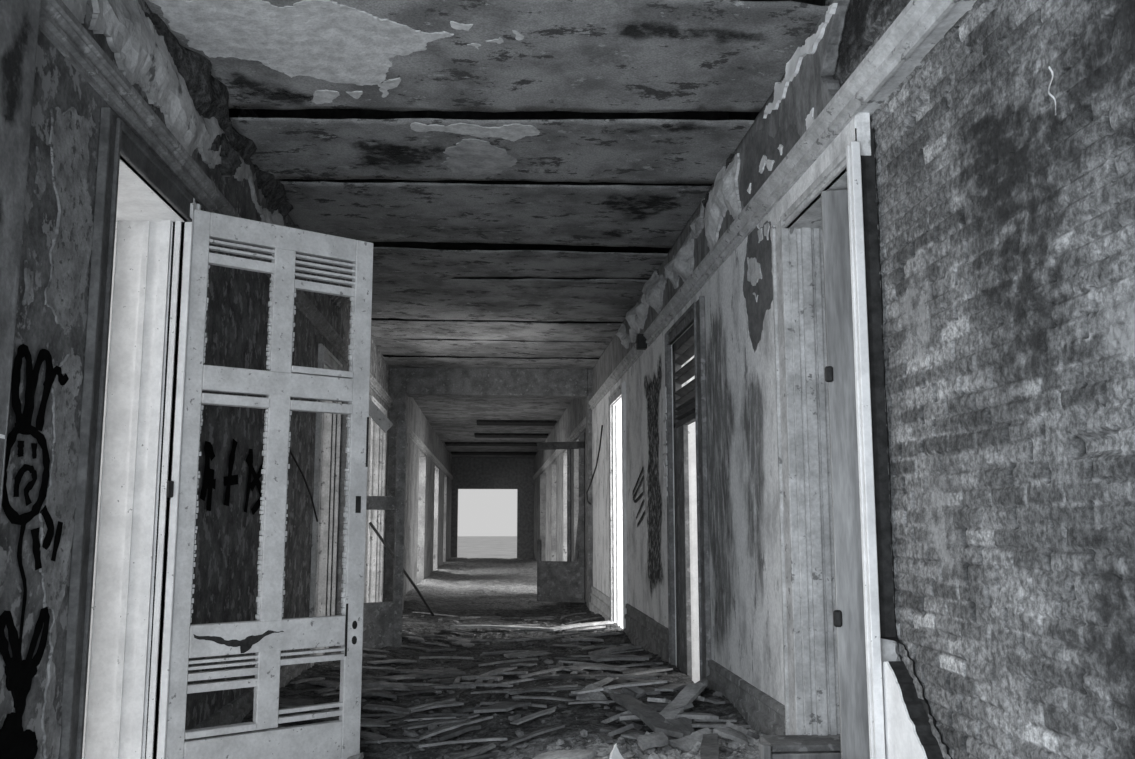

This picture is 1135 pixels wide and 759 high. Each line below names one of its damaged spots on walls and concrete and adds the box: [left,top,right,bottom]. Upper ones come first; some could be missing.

spalling [295,253,350,309]
peeling [144,0,540,230]
damp [355,142,445,165]
damp [604,195,675,220]
spalling [616,193,709,349]
peeling [743,221,773,352]
peeling [725,3,838,207]
damp [644,358,663,593]
damp [705,320,763,636]